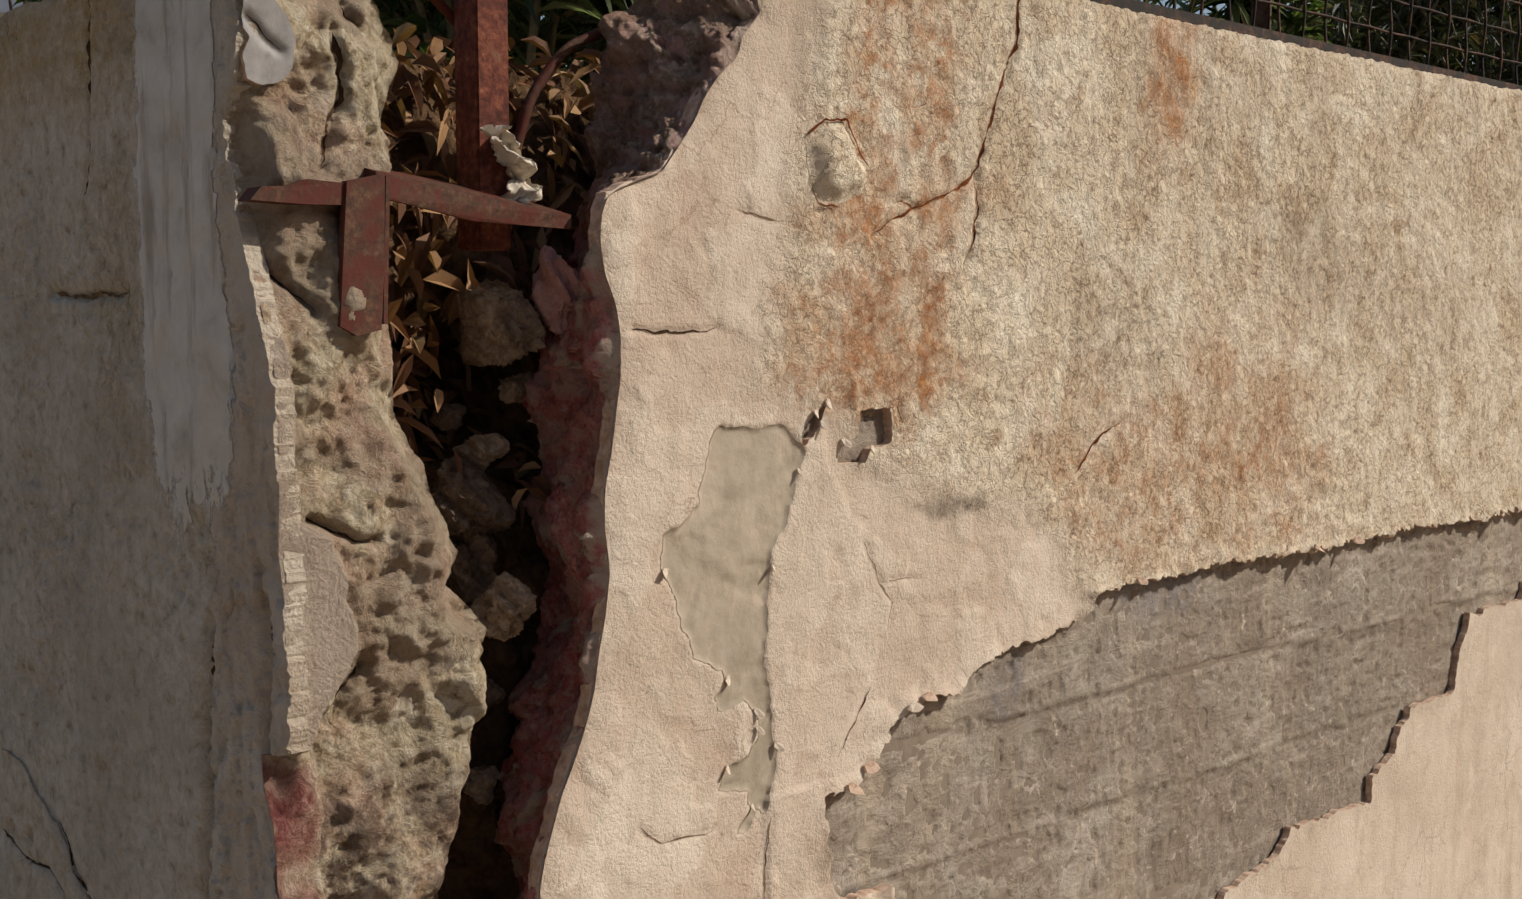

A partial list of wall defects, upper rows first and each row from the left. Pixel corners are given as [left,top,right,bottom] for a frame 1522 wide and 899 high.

crack [84,0,92,94]
crack [320,8,355,166]
crack [874,0,1020,273]
rust [1153,24,1190,133]
crack [739,209,789,222]
crack [57,291,130,300]
crack [633,326,716,334]
spalling [229,0,487,899]
spalling [825,509,1522,899]